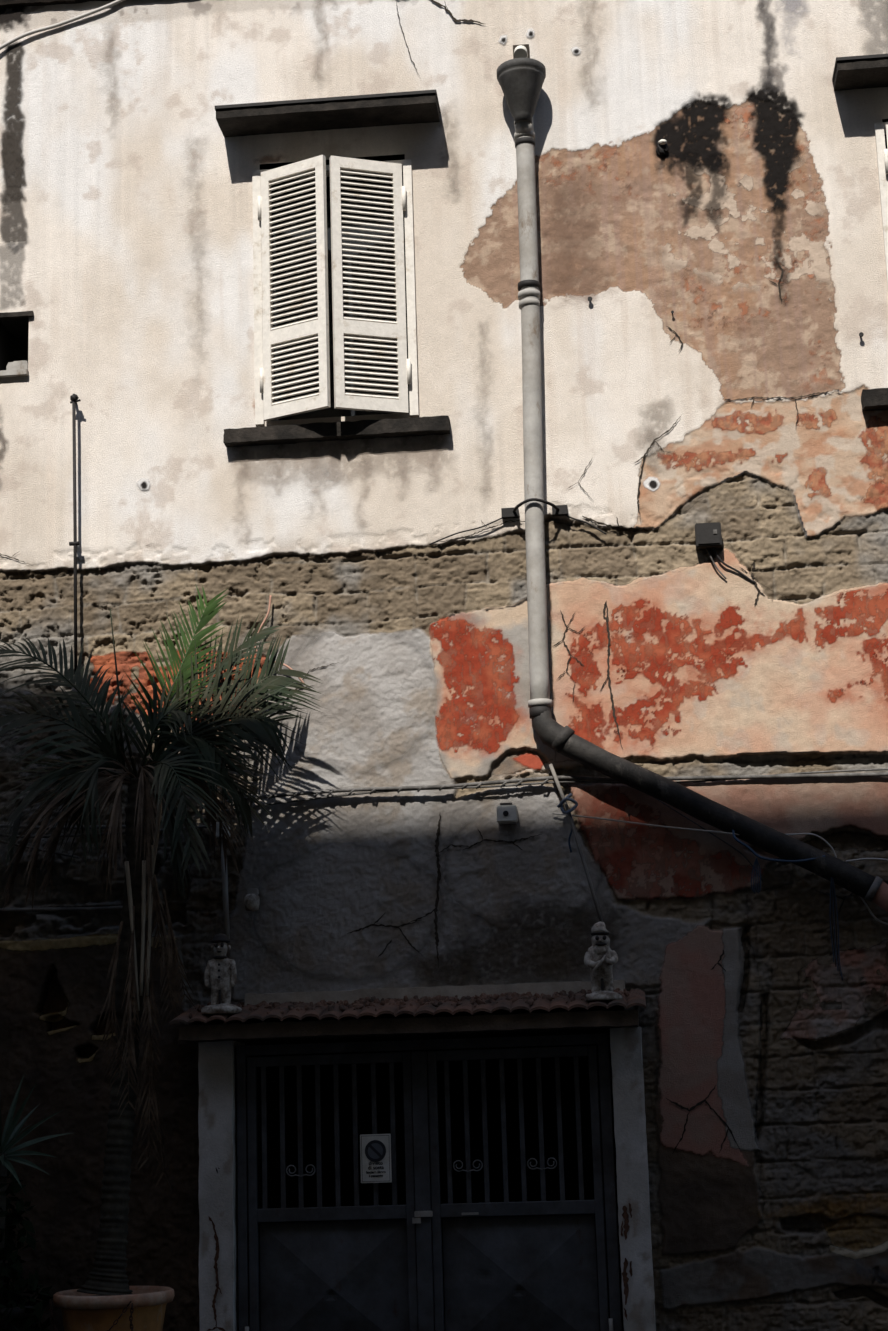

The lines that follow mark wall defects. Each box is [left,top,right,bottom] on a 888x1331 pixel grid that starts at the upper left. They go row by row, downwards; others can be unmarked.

crack [396,1,417,72]
crack [431,0,484,24]
leakage [654,95,731,223]
leakage [747,0,803,268]
peeling [460,181,520,308]
spalling [137,478,150,490]
peeling [535,99,888,841]
spalling [0,534,574,867]
crack [666,1086,741,1154]